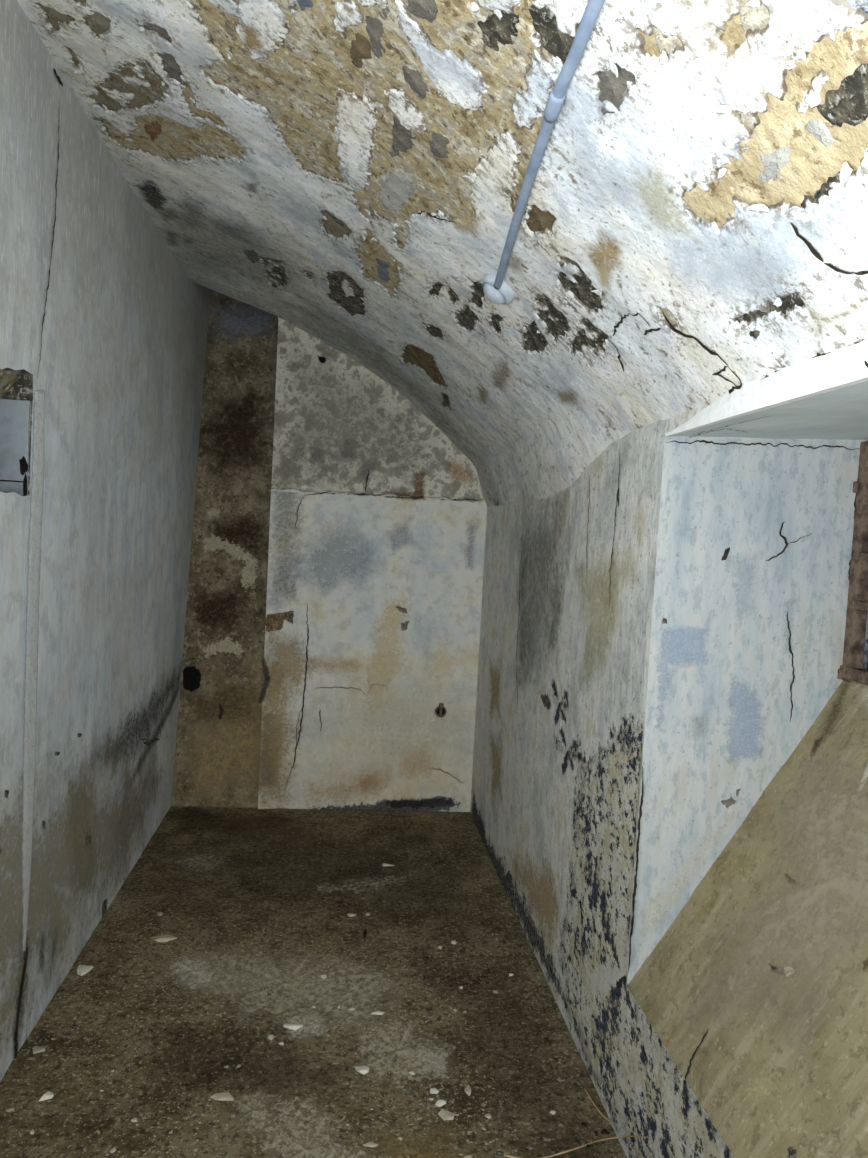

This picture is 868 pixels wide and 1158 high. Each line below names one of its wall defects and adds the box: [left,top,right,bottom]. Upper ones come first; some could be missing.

spalling [91,25,248,164]
spalling [190,0,574,318]
spalling [681,0,868,229]
crack [791,223,868,275]
peeling [521,258,609,354]
crack [608,312,781,394]
crack [666,416,855,450]
leakage [208,518,262,551]
leakage [193,633,309,806]
leakage [491,739,501,794]
crack [787,612,795,720]
leakage [706,685,868,1011]